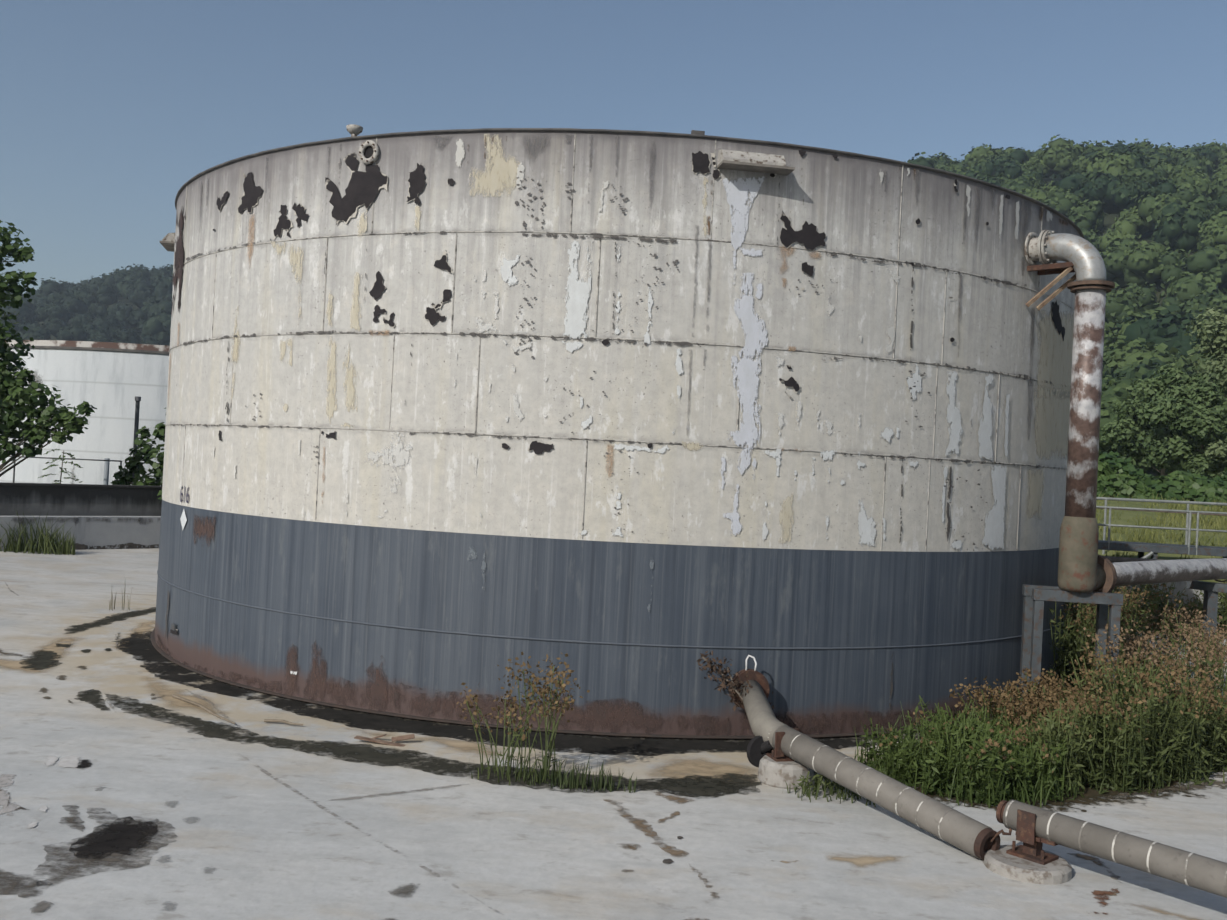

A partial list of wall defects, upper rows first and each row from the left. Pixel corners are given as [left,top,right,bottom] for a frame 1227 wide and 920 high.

peeling [216,172,263,213]
peeling [325,152,388,225]
peeling [273,202,309,240]
peeling [171,210,185,317]
peeling [434,252,453,274]
peeling [780,210,832,295]
peeling [369,271,395,328]
peeling [425,289,451,326]
rust [116,622,155,649]
damp [0,607,762,798]
damp [815,731,928,749]
rust [775,707,985,734]